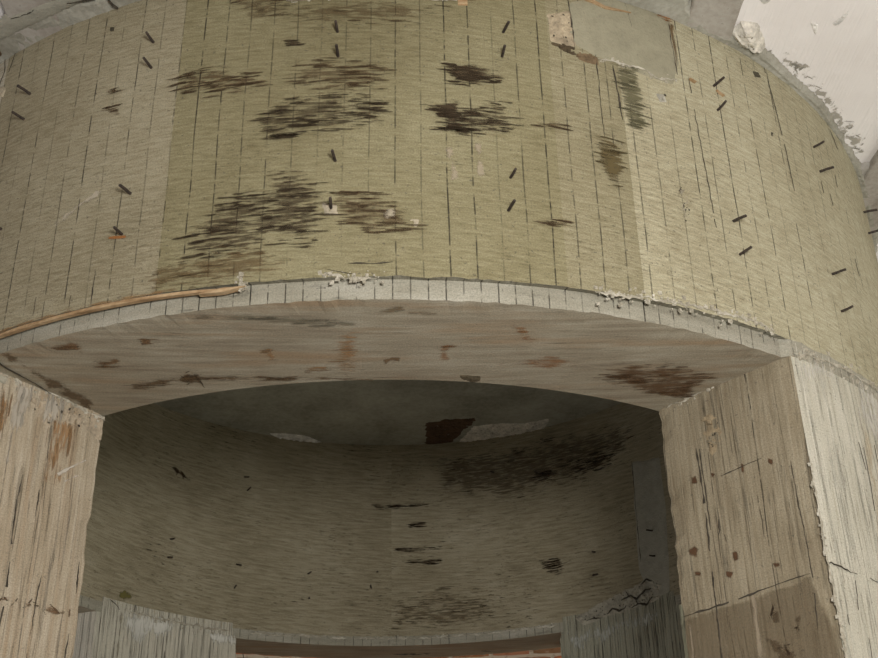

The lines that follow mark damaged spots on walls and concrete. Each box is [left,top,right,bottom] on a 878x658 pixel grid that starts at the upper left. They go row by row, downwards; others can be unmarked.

spalling [547,11,627,68]
damp [168,67,270,98]
damp [250,57,394,139]
damp [440,63,502,86]
damp [421,100,573,136]
damp [614,65,653,133]
damp [592,136,627,187]
damp [173,171,426,277]
crack [696,449,761,551]
crack [858,442,878,510]
crack [587,468,652,621]
crack [684,465,877,658]